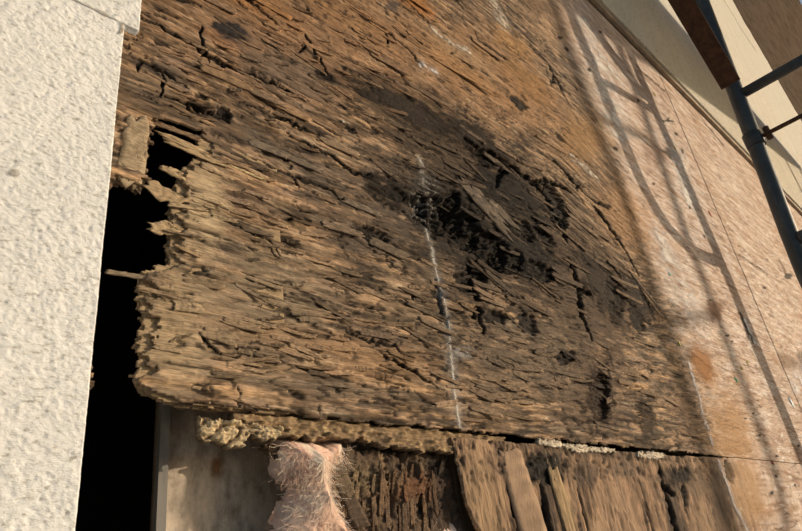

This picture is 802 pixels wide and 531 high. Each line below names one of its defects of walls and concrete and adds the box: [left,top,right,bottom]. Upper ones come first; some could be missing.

crack [74,0,293,94]
water stain [212,21,247,43]
crack [132,58,226,123]
crack [238,101,368,177]
water stain [316,66,564,285]
crack [568,264,590,336]
water stain [573,249,657,333]
corrosion [693,348,711,380]
spalling [227,412,547,531]